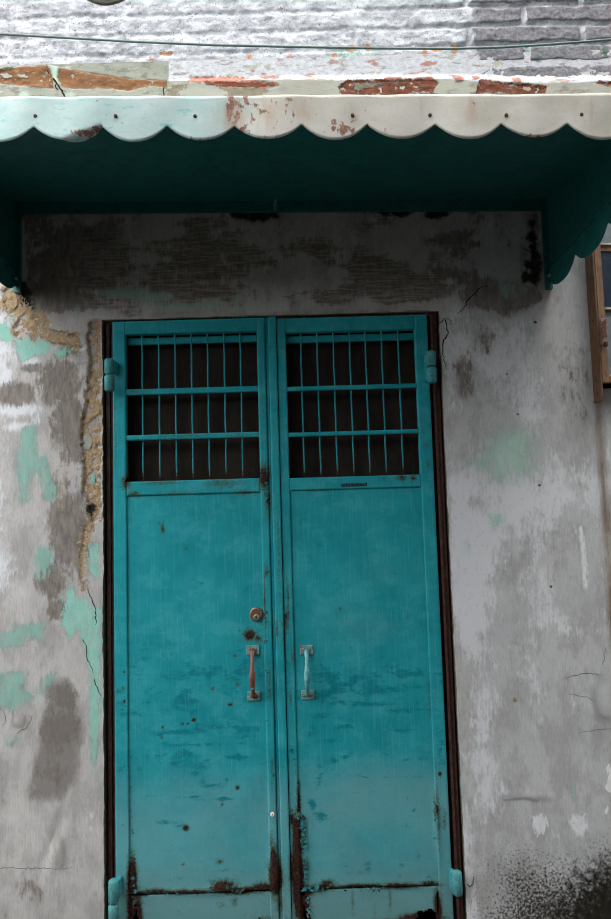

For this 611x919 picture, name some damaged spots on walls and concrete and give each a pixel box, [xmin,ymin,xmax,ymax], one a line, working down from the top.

spalling [0,65,279,96]
spalling [338,76,438,95]
spalling [452,75,547,95]
spalling [0,285,103,593]
crack [83,590,100,694]
leakage [31,682,79,798]
leakage [473,842,611,919]